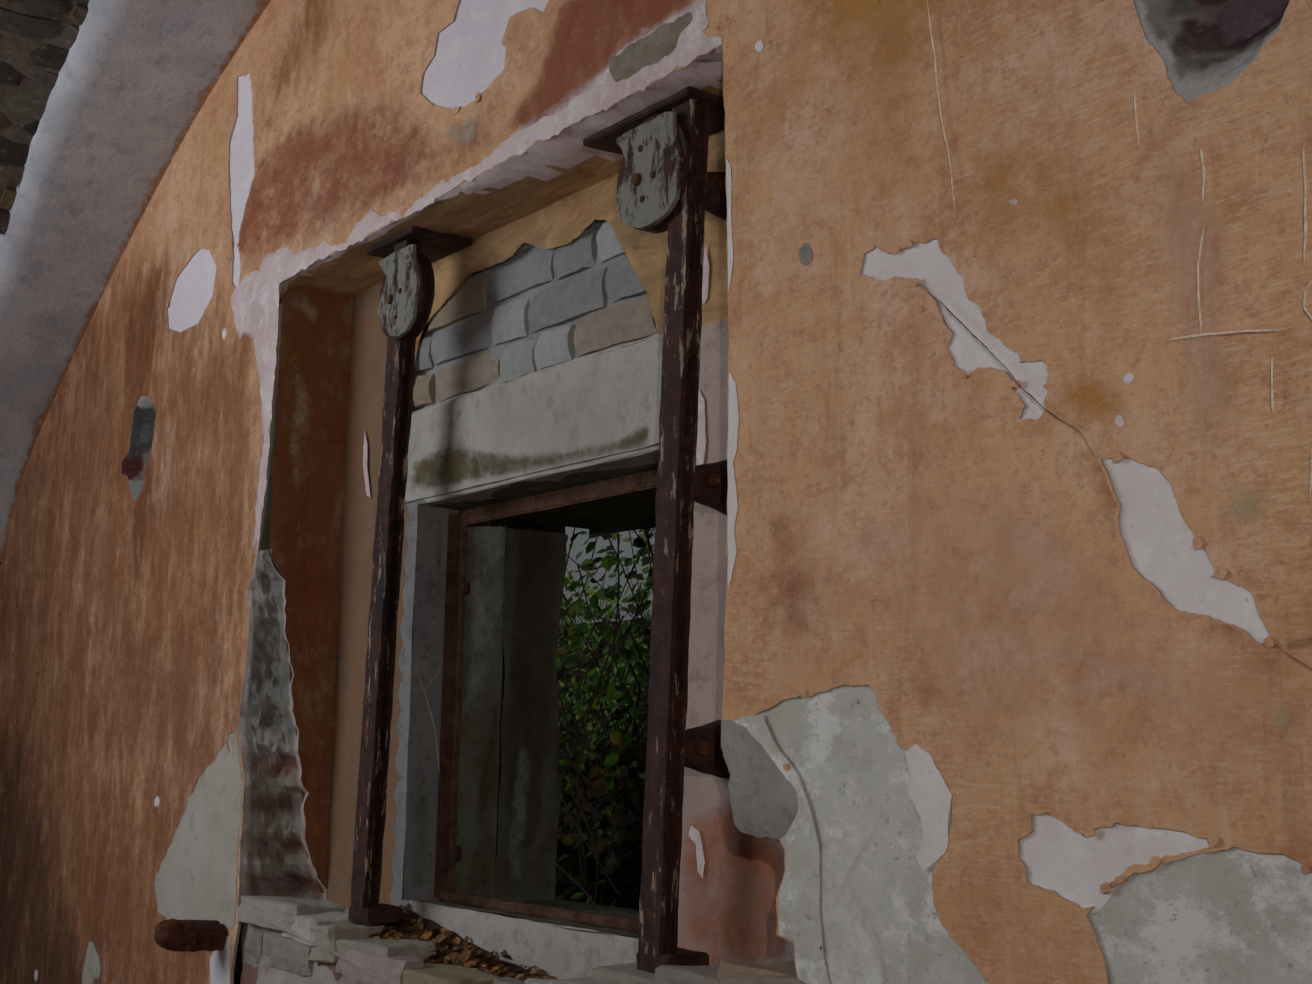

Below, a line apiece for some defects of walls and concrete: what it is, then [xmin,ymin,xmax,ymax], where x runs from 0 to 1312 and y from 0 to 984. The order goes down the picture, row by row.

spalling [1134,0,1290,103]
spalling [121,396,155,501]
peeling [153,0,989,984]
peeling [862,239,1049,420]
crack [919,285,1094,455]
peeling [1103,451,1275,648]
crack [1271,642,1312,670]
peeling [1020,813,1312,984]